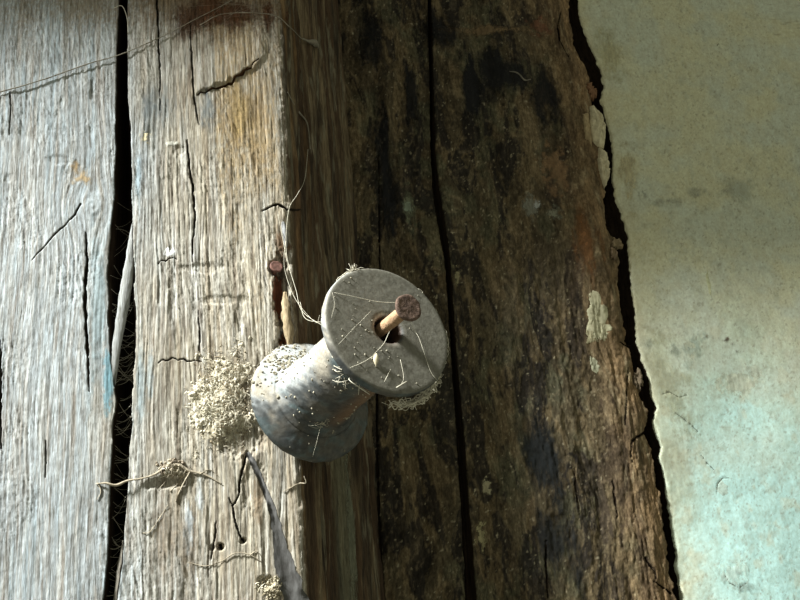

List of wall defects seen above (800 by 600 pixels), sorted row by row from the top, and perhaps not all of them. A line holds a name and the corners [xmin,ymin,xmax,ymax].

crack [190,20,259,124]
crack [32,204,81,260]
crack [158,141,196,264]
corrosion [272,275,283,319]
corrosion [276,233,292,261]
crack [428,0,476,600]
peeling [586,290,612,344]
crack [557,0,695,600]
crack [211,456,247,559]